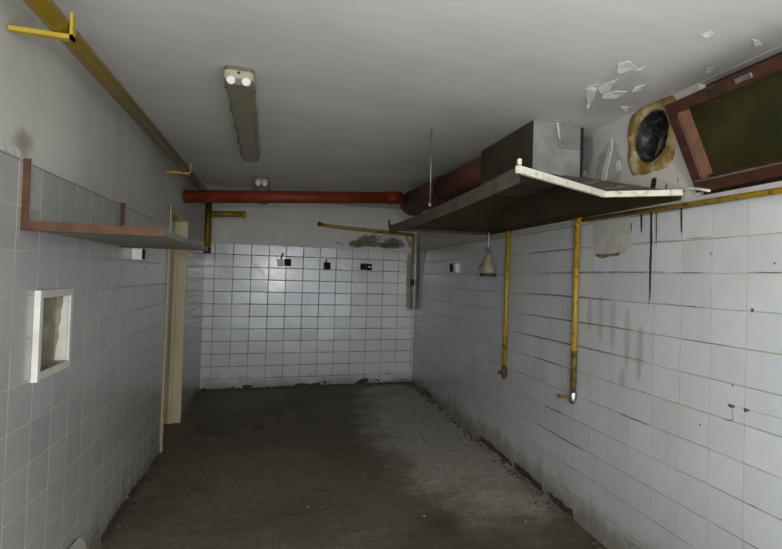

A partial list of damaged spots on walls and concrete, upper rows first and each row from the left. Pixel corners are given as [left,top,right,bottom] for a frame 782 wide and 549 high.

peeling [585,61,646,114]
water stain [349,235,426,307]